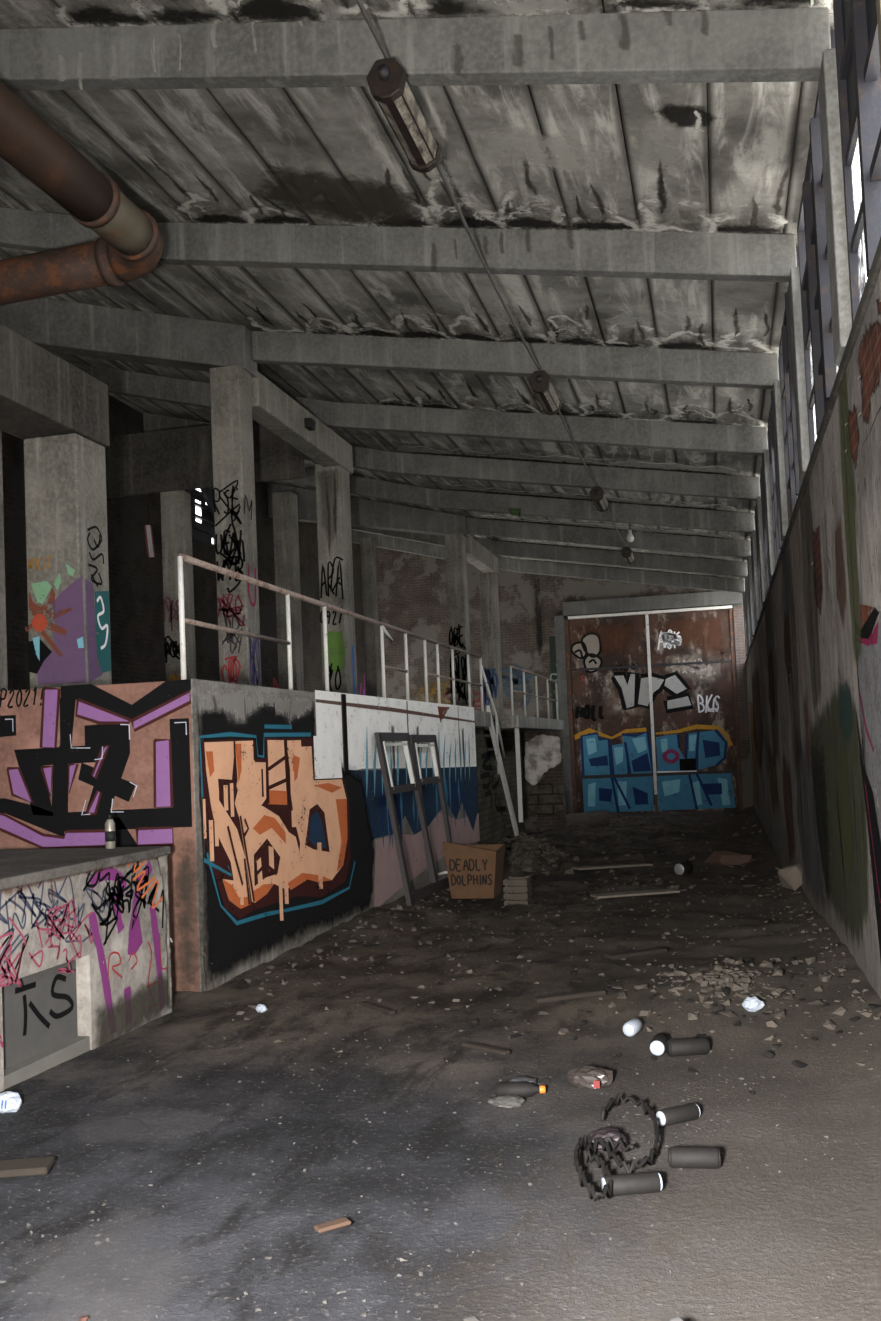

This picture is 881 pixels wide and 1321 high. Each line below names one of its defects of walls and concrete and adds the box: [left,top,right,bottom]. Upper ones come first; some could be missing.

leakage [146,154,788,234]